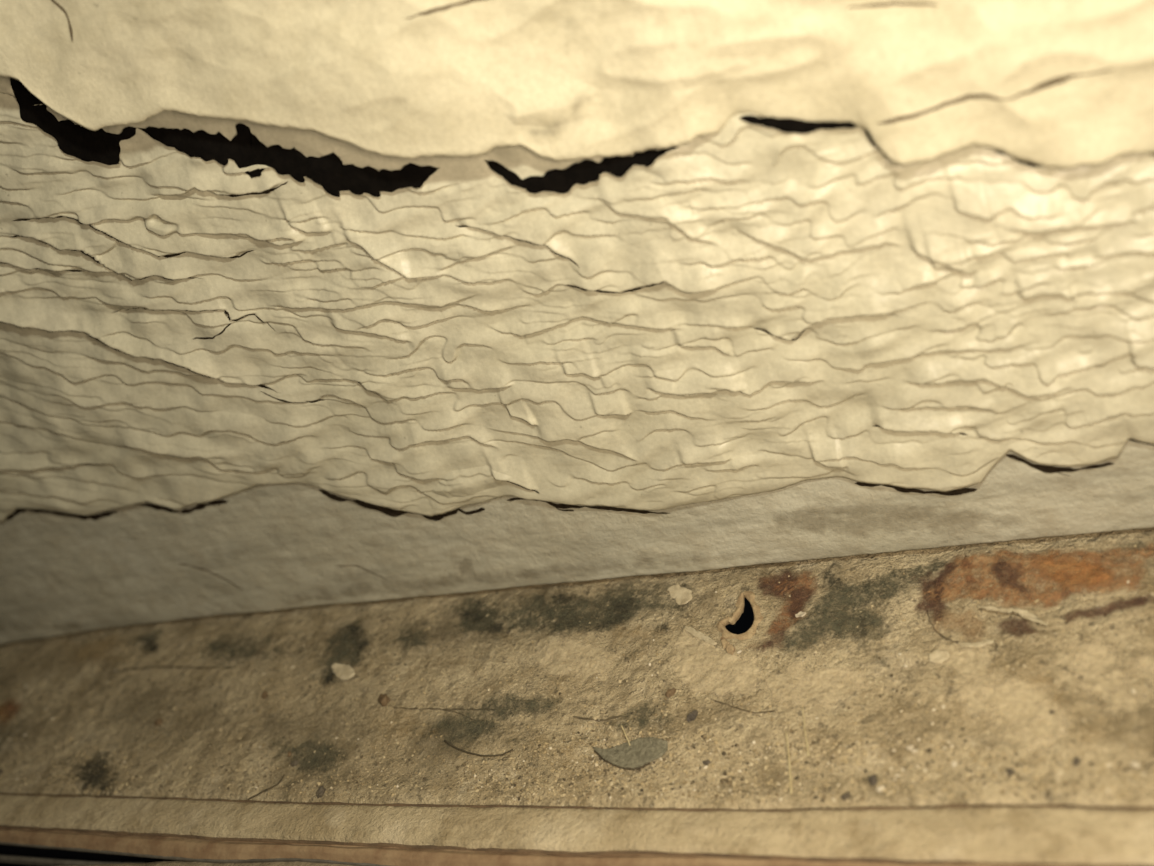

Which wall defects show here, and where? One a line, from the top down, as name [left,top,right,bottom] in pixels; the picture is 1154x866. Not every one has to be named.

crack [10,78,441,197]
crack [485,146,679,194]
crack [738,69,1117,158]
peeling [0,0,1154,521]
crack [1006,439,1154,476]
crack [5,500,228,520]
crack [320,481,669,521]
leakage [457,584,680,633]
rust [759,571,814,648]
leakage [783,559,940,651]
rust [915,545,1154,636]
leakage [323,623,368,684]